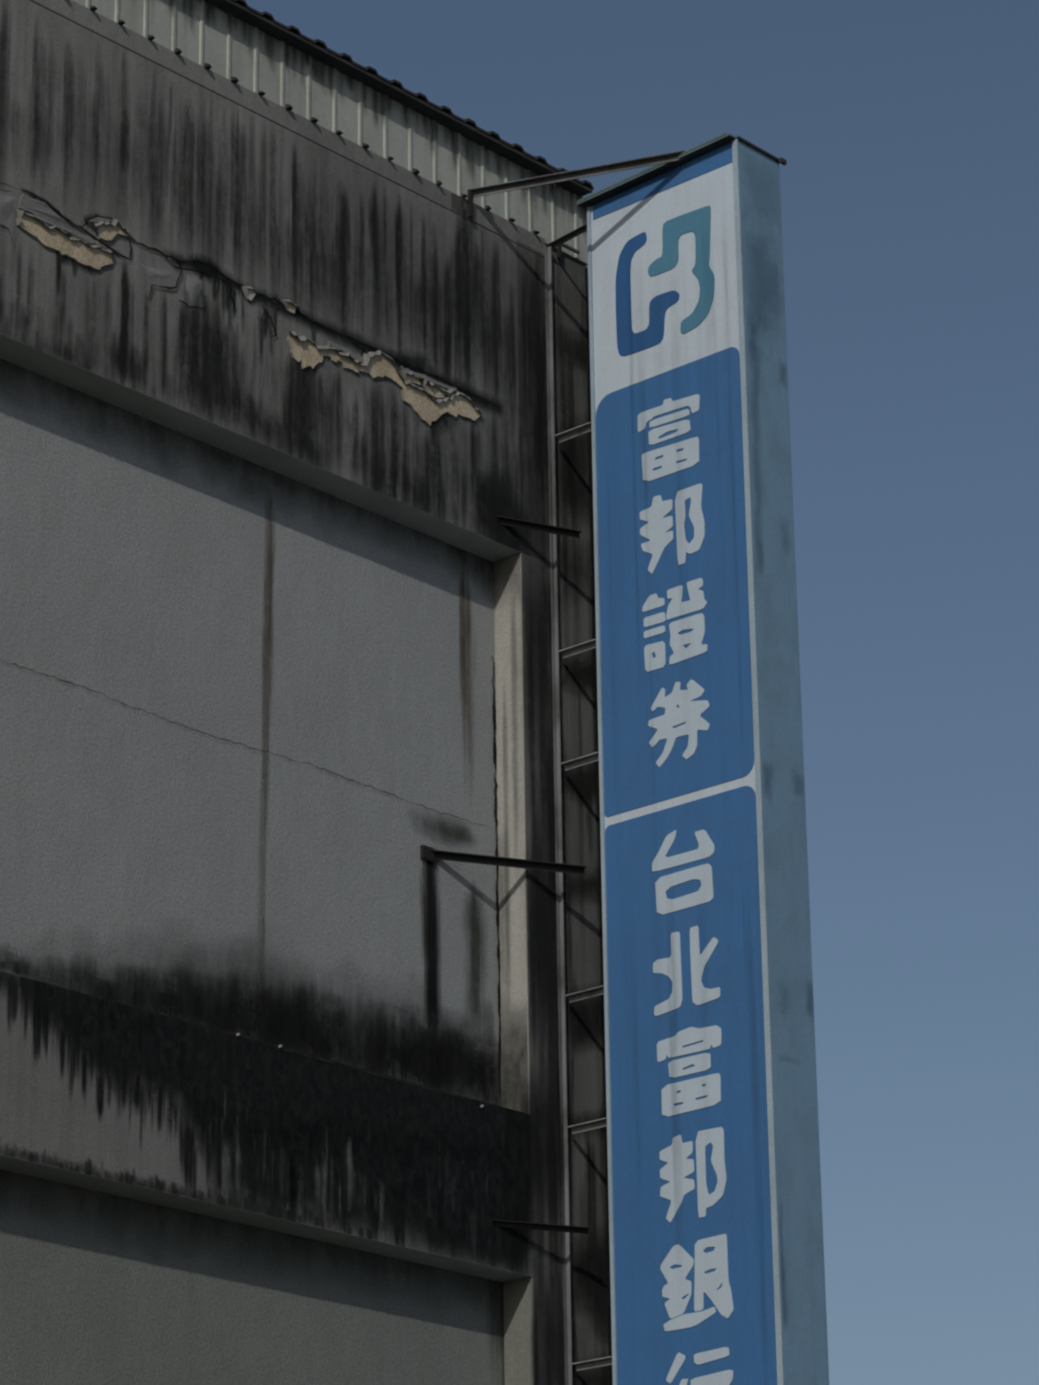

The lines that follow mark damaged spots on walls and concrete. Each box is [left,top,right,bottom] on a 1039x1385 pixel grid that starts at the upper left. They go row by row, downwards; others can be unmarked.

peeling [16,194,130,271]
leakage [57,252,93,289]
leakage [116,273,147,373]
peeling [241,286,255,302]
crack [0,182,500,407]
leakage [171,194,543,471]
peeling [280,299,482,427]
leakage [563,400,596,688]
crack [13,504,501,1095]
leakage [529,602,605,1046]
leakage [0,861,611,1328]
leakage [559,1324,613,1385]